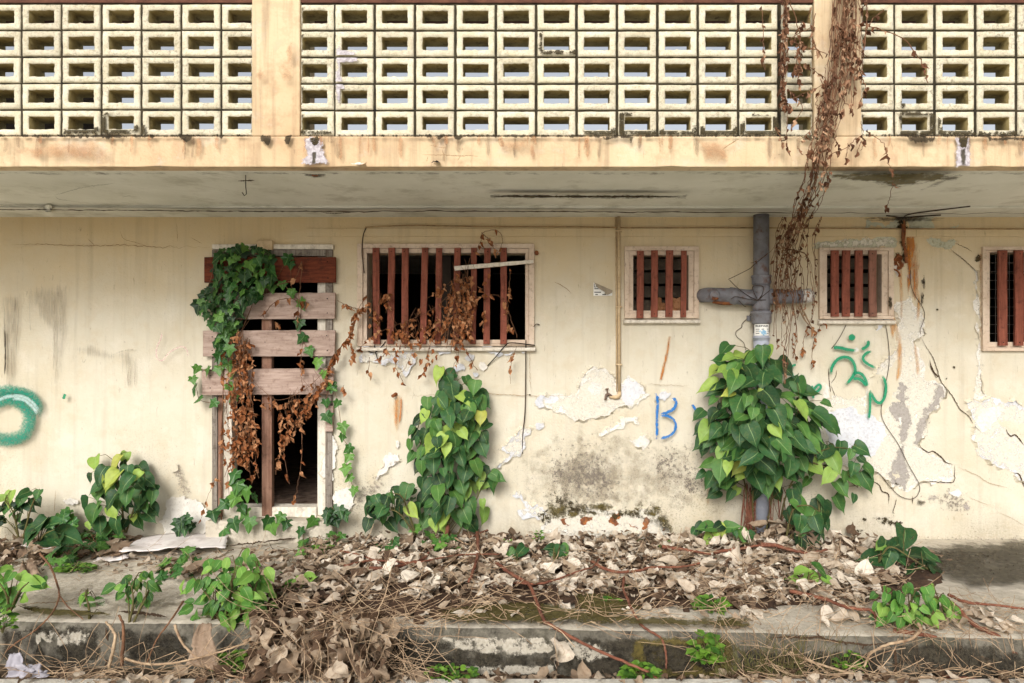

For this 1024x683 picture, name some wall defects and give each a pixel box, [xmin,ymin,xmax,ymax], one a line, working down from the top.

corrosion [894,237,920,310]
peeling [375,441,402,480]
peeling [359,346,533,379]
peeling [495,423,544,470]
peeling [529,365,671,450]
mould [538,439,672,531]
mould [654,446,702,497]
peeling [819,297,955,505]
crack [921,338,977,428]
peeling [963,254,1024,483]